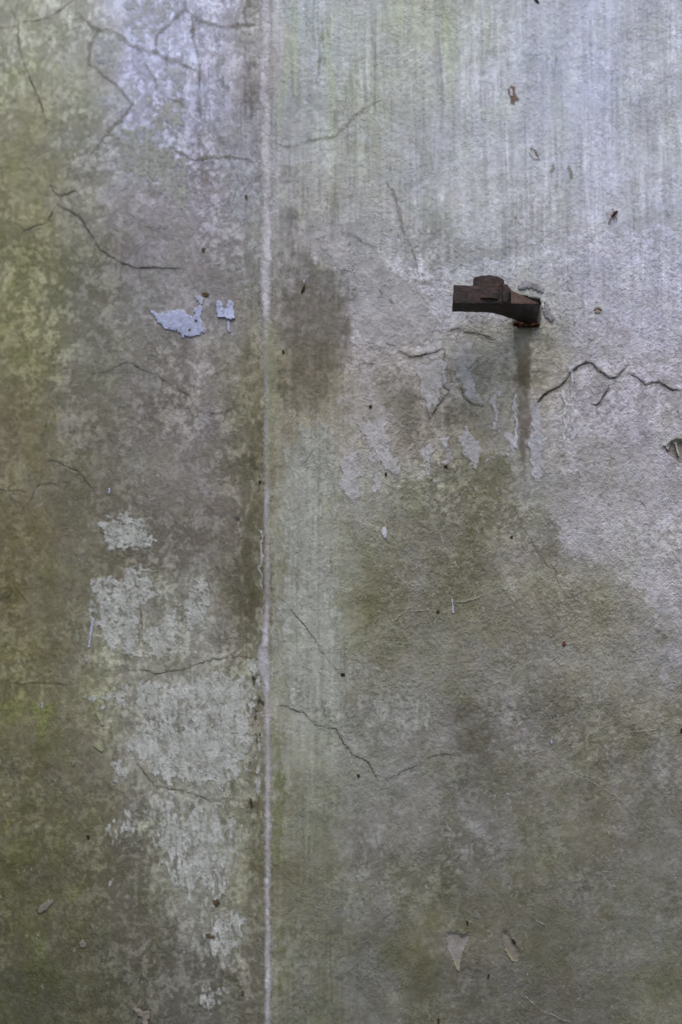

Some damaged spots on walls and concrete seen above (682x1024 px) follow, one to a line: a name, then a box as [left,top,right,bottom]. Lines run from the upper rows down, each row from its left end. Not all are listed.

crack [88,13,256,101]
crack [23,181,193,272]
peeling [415,333,514,476]
leakage [510,393,546,481]
crack [538,362,677,406]
crack [281,694,454,787]
spalling [446,920,470,972]